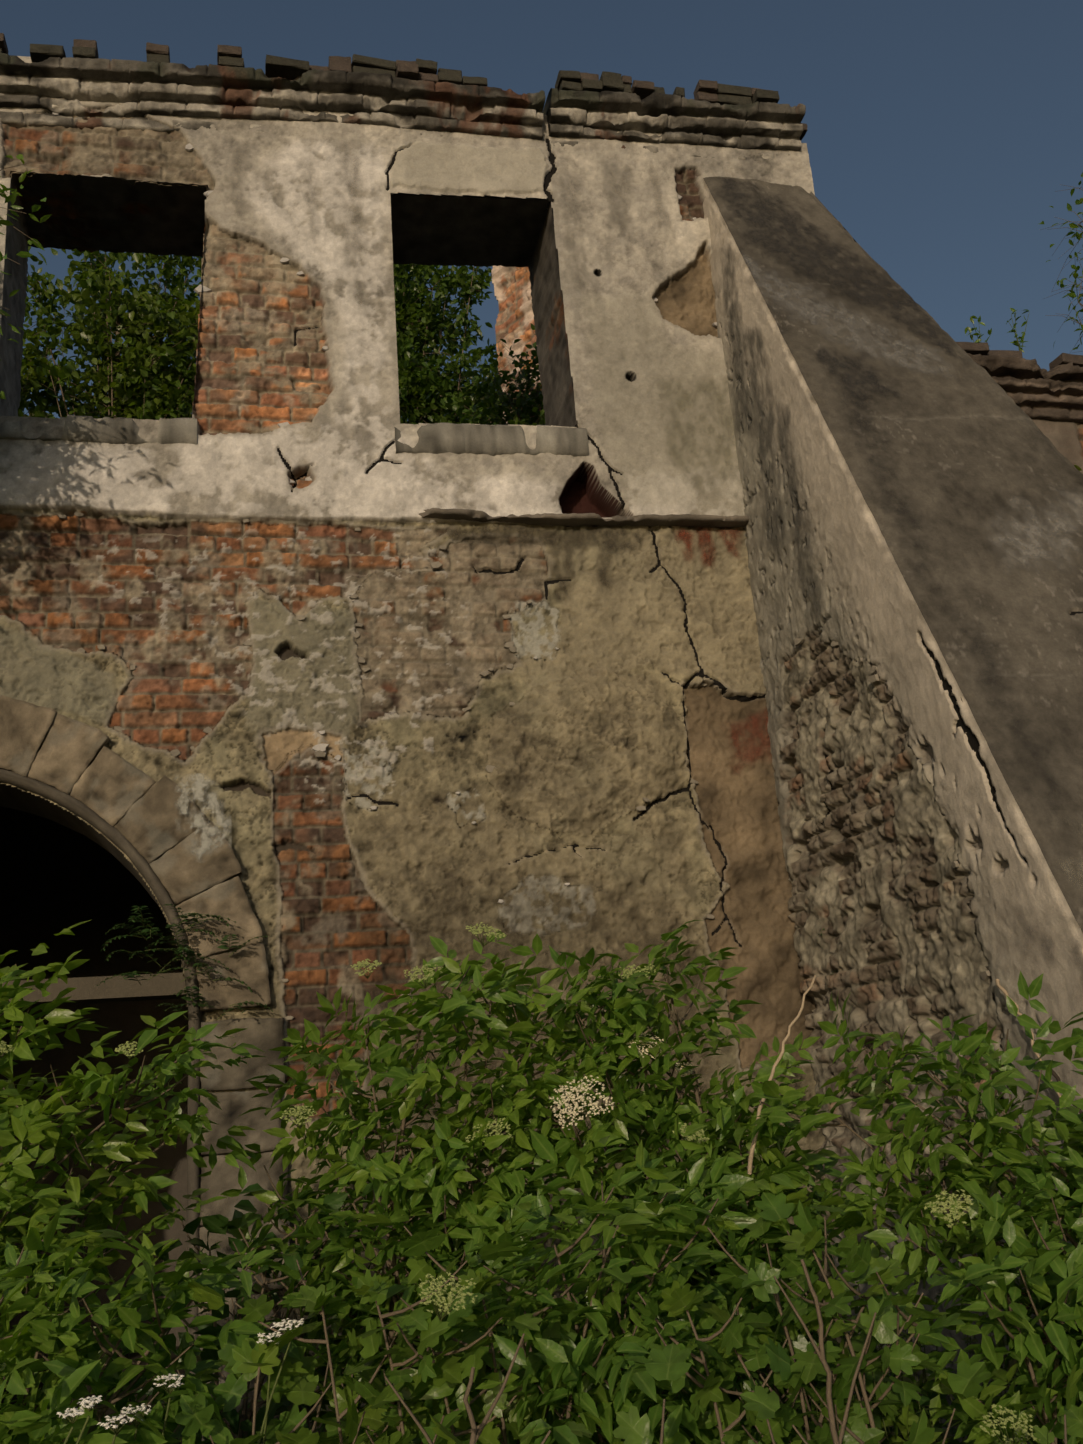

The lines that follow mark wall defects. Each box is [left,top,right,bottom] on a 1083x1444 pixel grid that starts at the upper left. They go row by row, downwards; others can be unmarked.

spalling [194,219,333,435]
crack [543,138,557,201]
spalling [653,247,718,337]
spalling [675,168,704,221]
crack [277,448,312,492]
crack [366,441,402,474]
crack [575,424,625,509]
spalling [0,511,561,760]
crack [633,531,766,947]
crack [921,639,1027,863]
spalling [263,729,412,1121]
spalling [684,630,1010,1242]